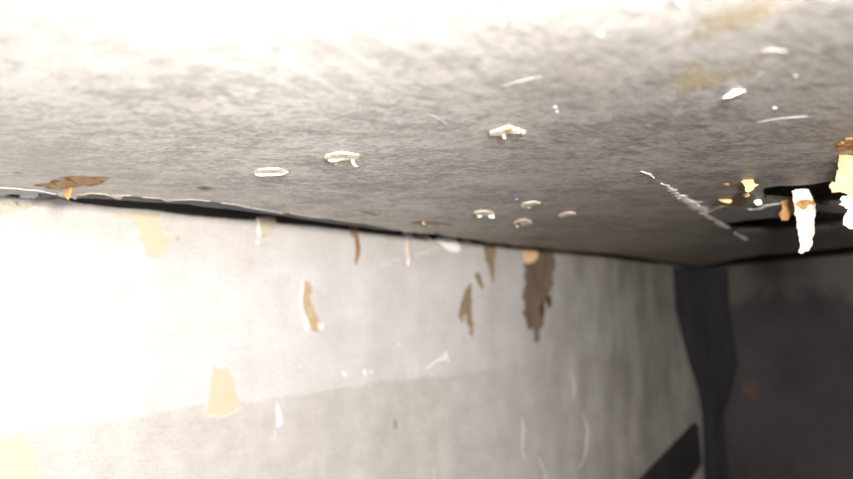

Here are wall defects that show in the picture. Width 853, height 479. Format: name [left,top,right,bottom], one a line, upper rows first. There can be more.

peeling [488,124,527,139]
peeling [253,168,291,177]
peeling [323,151,360,167]
spalling [708,137,853,254]
peeling [112,212,179,258]
peeling [349,225,360,265]
peeling [524,250,538,263]
peeling [299,280,324,332]
peeling [205,365,243,418]
peeling [0,430,39,479]